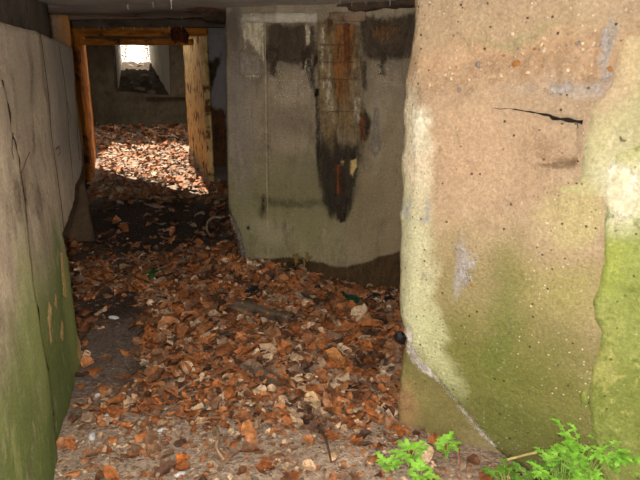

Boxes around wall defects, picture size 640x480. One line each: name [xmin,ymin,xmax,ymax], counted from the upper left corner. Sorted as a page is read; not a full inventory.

crack [7,102,30,228]
damp [240,13,415,222]
rust [327,19,354,106]
crack [495,108,583,128]